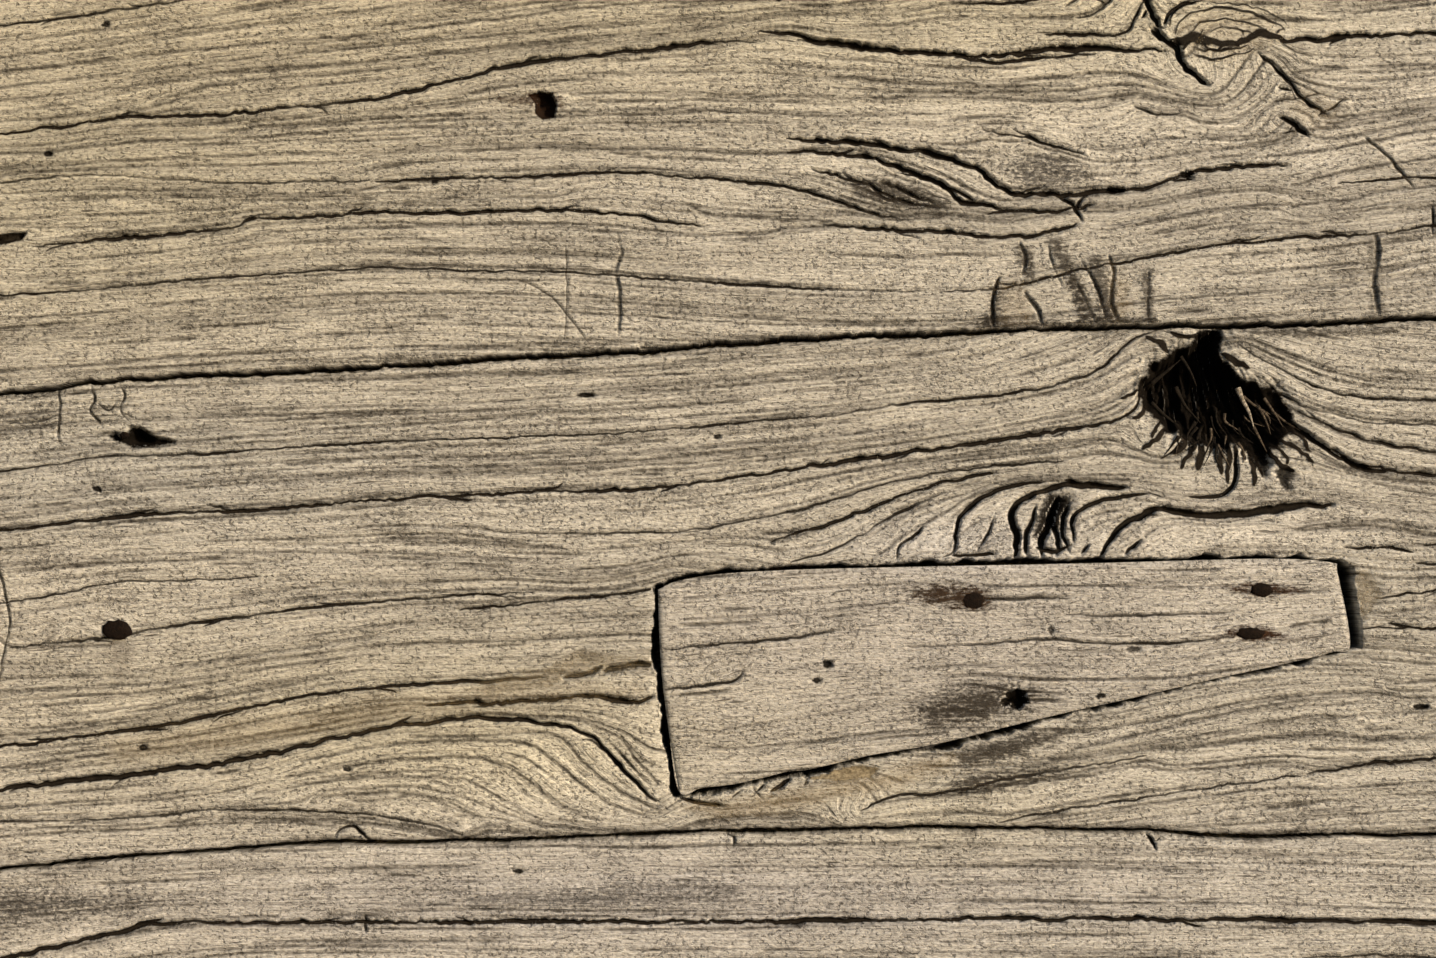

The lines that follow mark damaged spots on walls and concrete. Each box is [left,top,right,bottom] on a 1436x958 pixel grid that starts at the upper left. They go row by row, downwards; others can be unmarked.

crack [0,0,1207,135]
crack [35,31,1436,252]
crack [0,224,1436,297]
crack [0,329,1162,473]
crack [0,391,1332,563]
crack [1238,343,1436,477]
crack [0,574,675,679]
rust [906,579,993,617]
rust [1227,625,1284,642]
rust [1225,581,1300,598]
crack [0,630,832,845]
crack [999,757,1436,823]